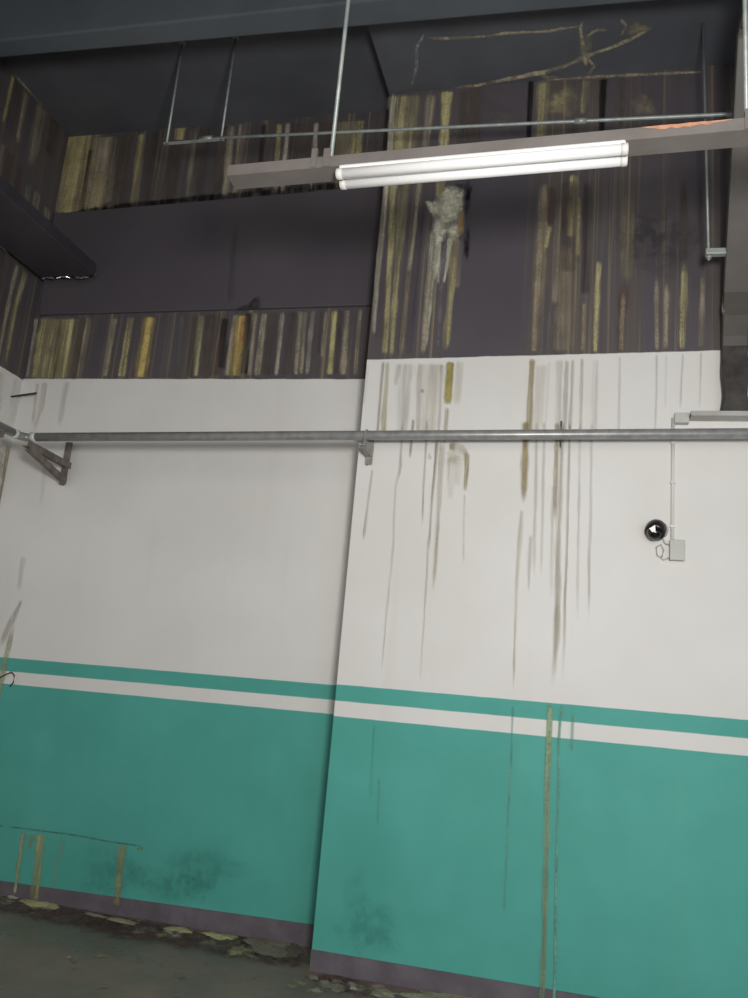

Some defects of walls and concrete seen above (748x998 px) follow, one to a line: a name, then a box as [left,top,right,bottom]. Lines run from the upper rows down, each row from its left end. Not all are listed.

crack [411,20,693,87]
damp [388,96,413,150]
damp [427,92,452,146]
damp [374,183,463,352]
damp [276,313,304,374]
damp [321,311,361,374]
damp [445,363,454,403]